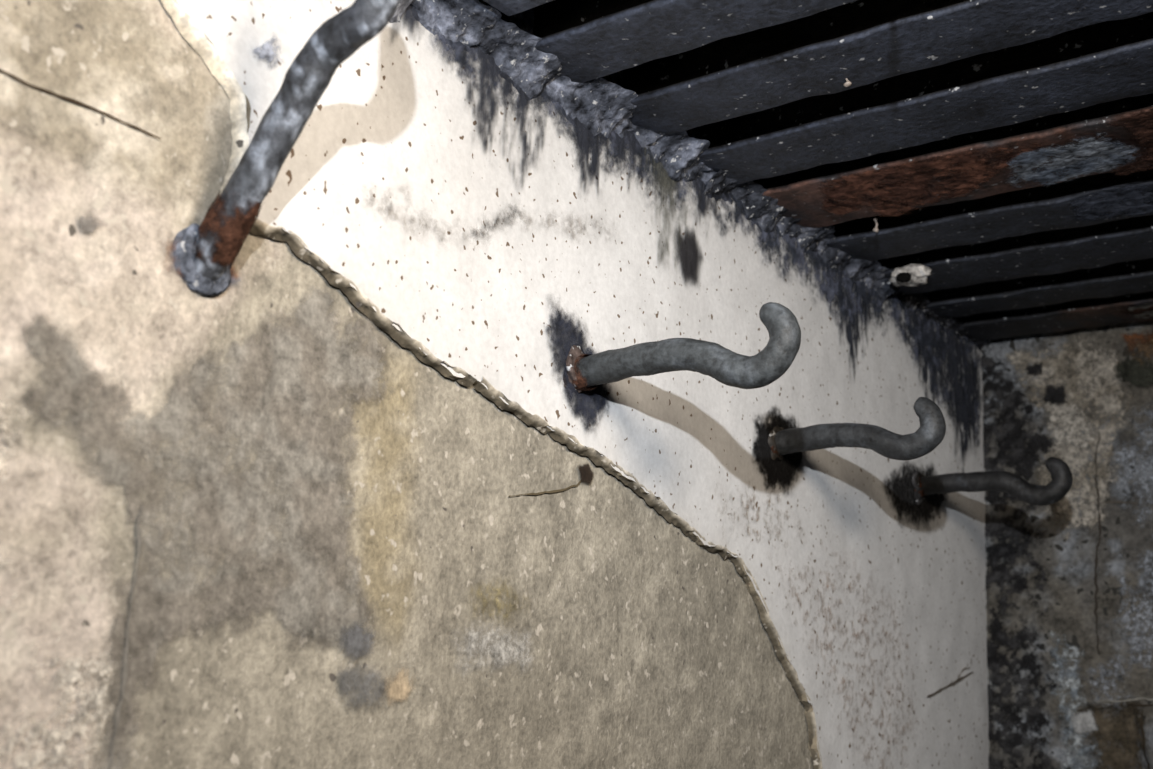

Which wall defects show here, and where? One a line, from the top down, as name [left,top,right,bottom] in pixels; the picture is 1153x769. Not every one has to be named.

damp [403,5,419,32]
damp [461,48,544,173]
damp [575,117,645,186]
damp [695,176,717,216]
spalling [0,0,823,769]
damp [821,262,870,375]
damp [898,298,1066,479]
damp [1114,356,1153,389]
damp [1109,411,1153,522]
damp [0,289,411,769]
damp [985,490,1153,769]
crack [1077,697,1153,769]